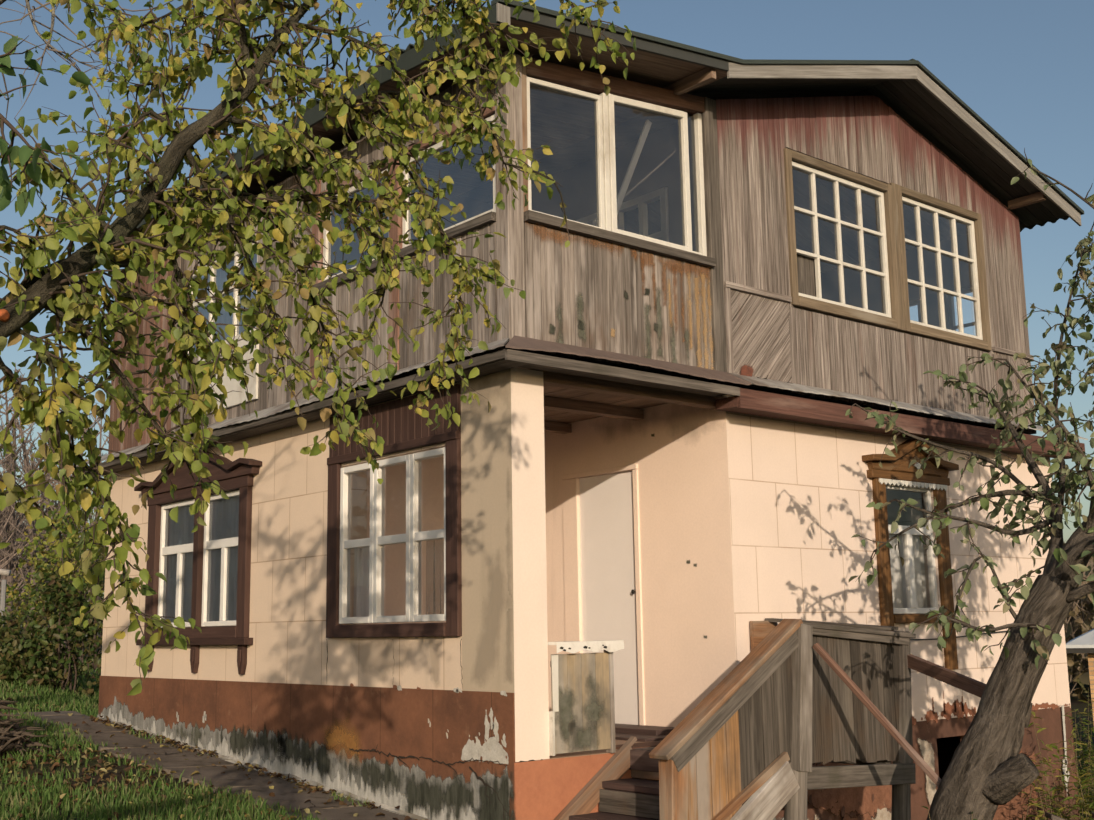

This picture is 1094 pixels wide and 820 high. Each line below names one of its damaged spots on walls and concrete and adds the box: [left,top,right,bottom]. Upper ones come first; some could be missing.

leakage [176,724,205,746]
peeling [97,696,513,820]
leakage [220,725,514,820]
peeling [807,785,892,820]
peeling [918,738,937,805]
peeling [993,780,1043,820]